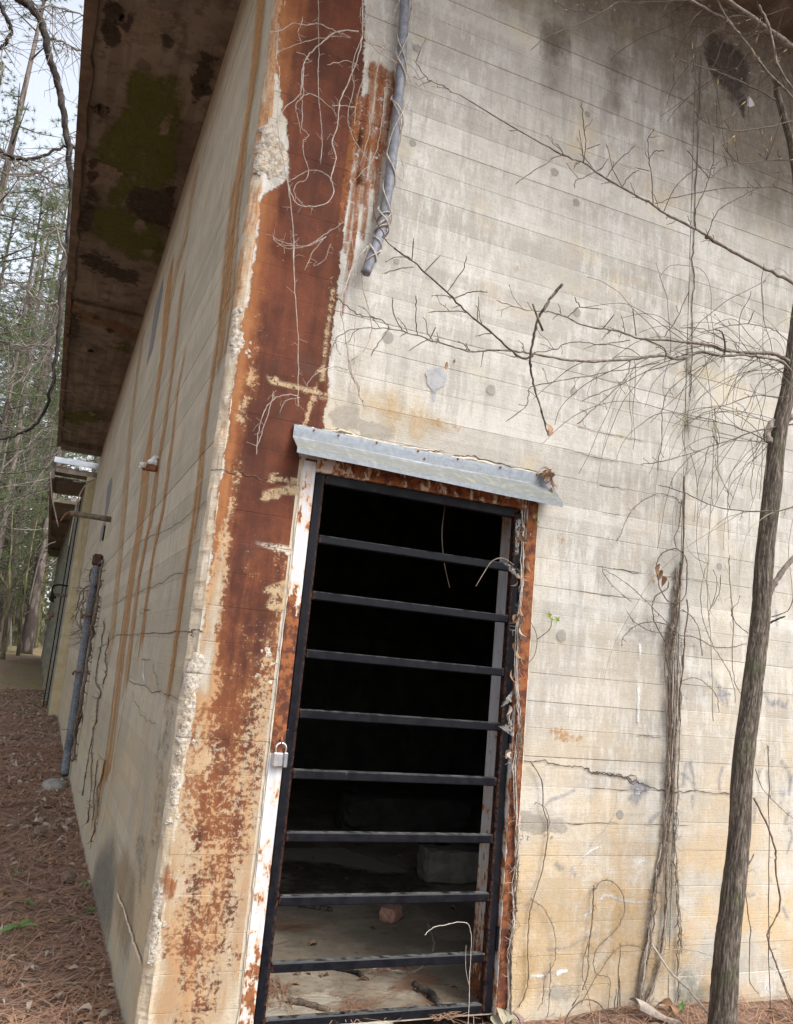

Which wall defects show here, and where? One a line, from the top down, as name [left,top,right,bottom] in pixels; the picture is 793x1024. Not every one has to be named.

damp [100,0,124,49]
damp [700,10,793,207]
rust [91,259,185,828]
spalling [134,0,288,1024]
crack [211,464,266,481]
rust [156,0,396,1024]
crack [503,756,730,794]